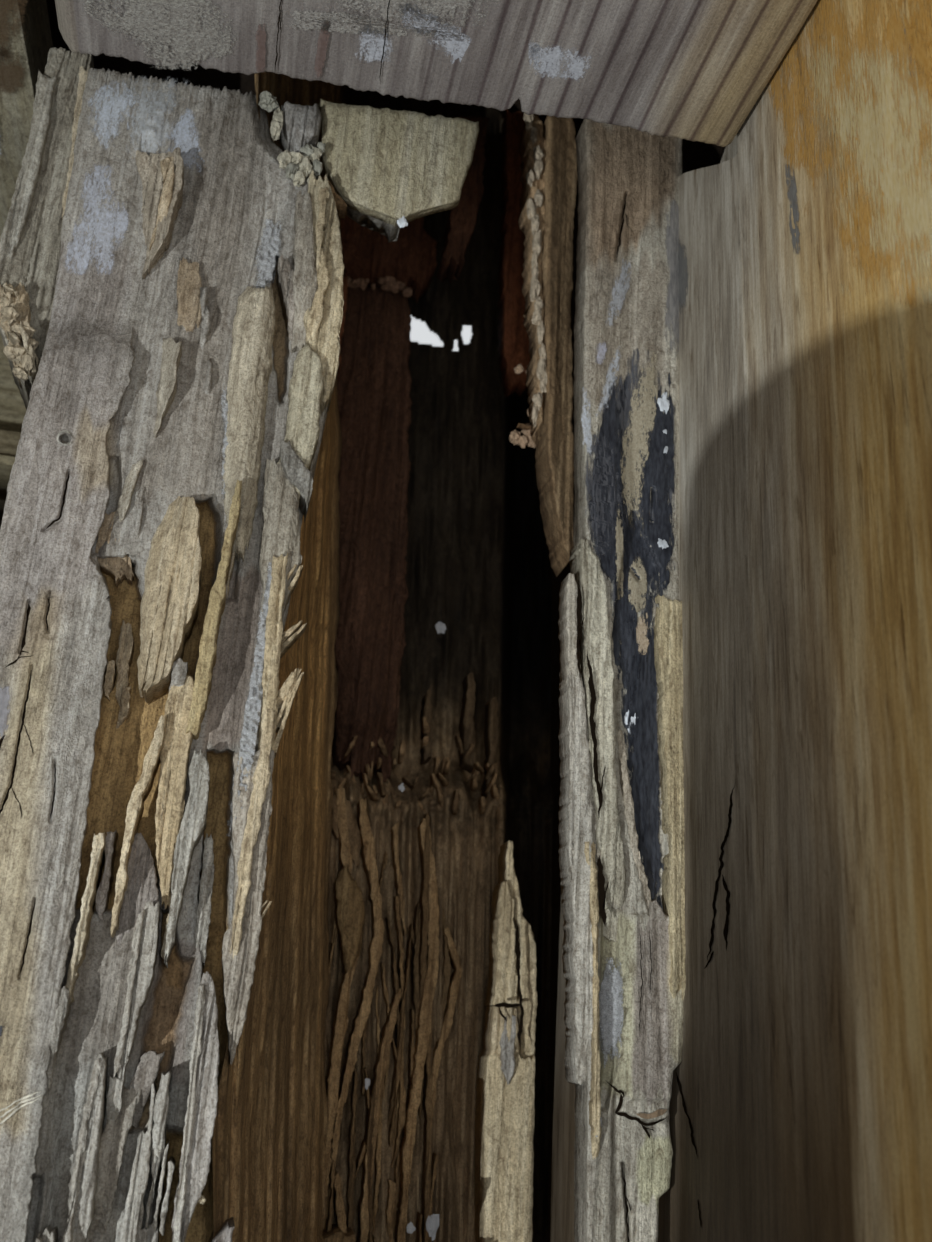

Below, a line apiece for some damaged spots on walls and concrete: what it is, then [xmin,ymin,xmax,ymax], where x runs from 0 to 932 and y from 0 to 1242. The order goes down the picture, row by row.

peeling [0,47,94,410]
peeling [132,147,184,279]
peeling [153,257,212,438]
peeling [223,284,275,562]
peeling [279,439,313,523]
peeling [657,392,670,414]
peeling [95,459,202,705]
spalling [0,686,10,748]
crack [704,780,736,969]
peeling [209,1217,235,1242]